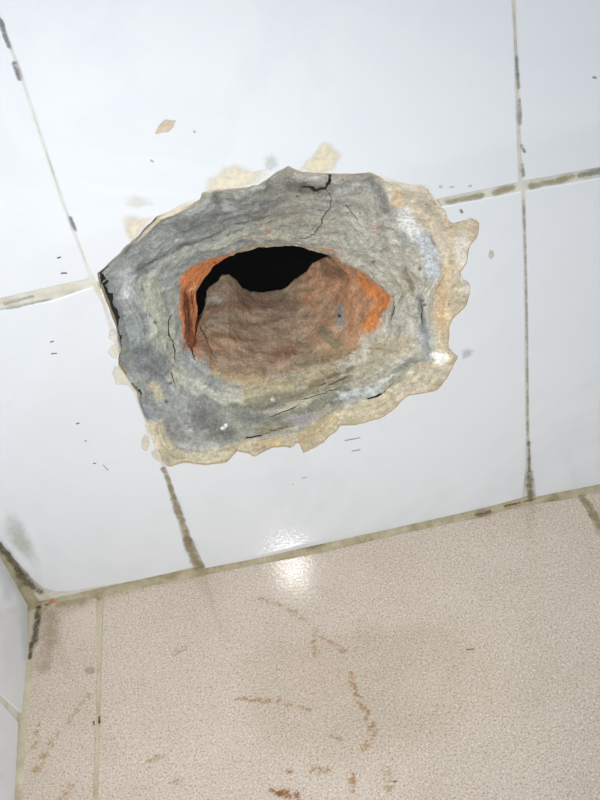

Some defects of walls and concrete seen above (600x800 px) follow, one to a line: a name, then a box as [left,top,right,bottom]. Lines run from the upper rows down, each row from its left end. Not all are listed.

crack [301,174,357,239]
spalling [98,145,479,466]
leakage [0,543,43,594]
leakage [28,603,50,659]